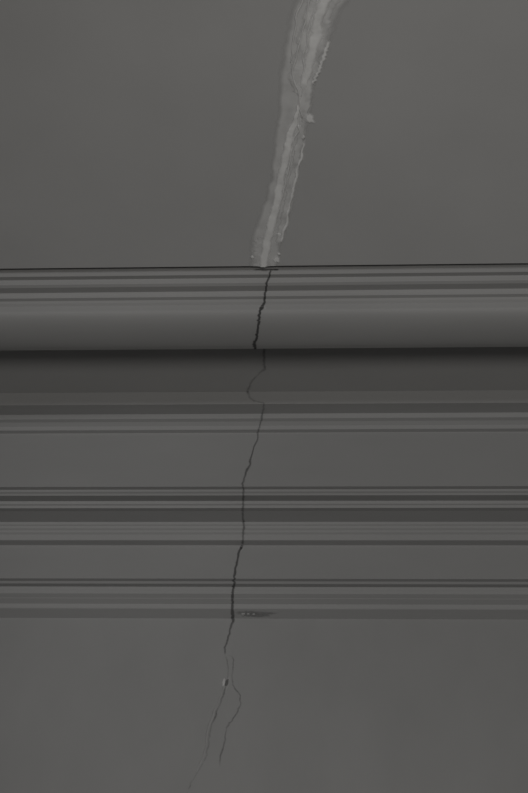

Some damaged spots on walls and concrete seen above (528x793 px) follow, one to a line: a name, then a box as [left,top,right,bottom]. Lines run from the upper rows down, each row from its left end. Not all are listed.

water stain [301,0,331,87]
water stain [260,105,305,267]
crack [253,269,278,349]
crack [231,547,242,622]